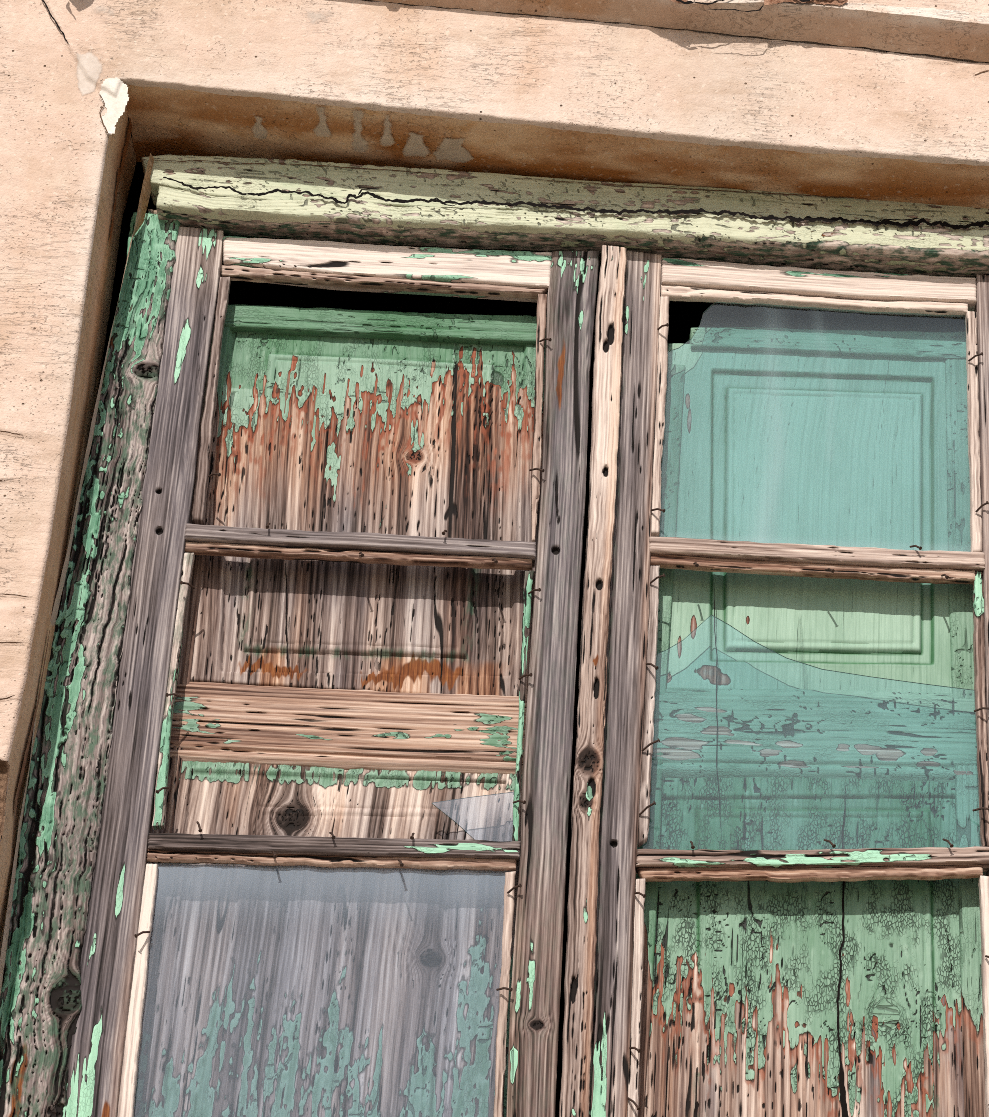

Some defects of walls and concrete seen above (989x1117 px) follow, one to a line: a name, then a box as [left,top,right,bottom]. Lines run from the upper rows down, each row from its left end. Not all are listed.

crack [42,0,69,44]
peeling [77,53,129,134]
crack [153,160,989,230]
spalling [0,630,50,839]